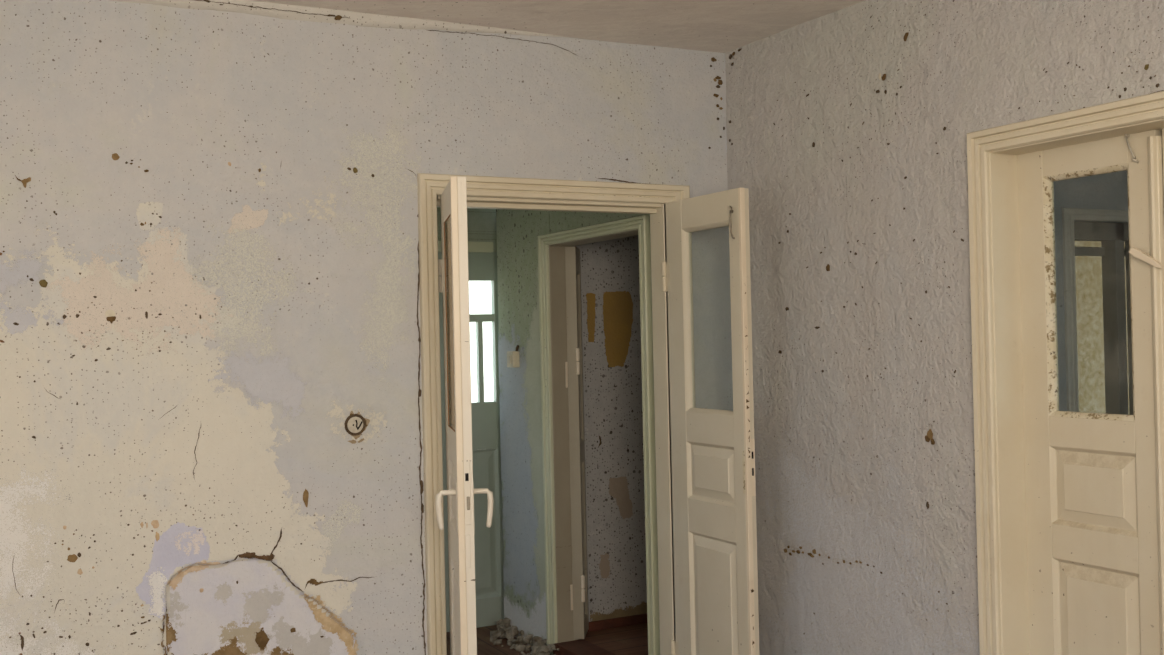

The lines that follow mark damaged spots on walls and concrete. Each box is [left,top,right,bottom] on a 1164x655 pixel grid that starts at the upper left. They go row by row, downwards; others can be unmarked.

peeling [0,201,372,655]
peeling [586,291,633,367]